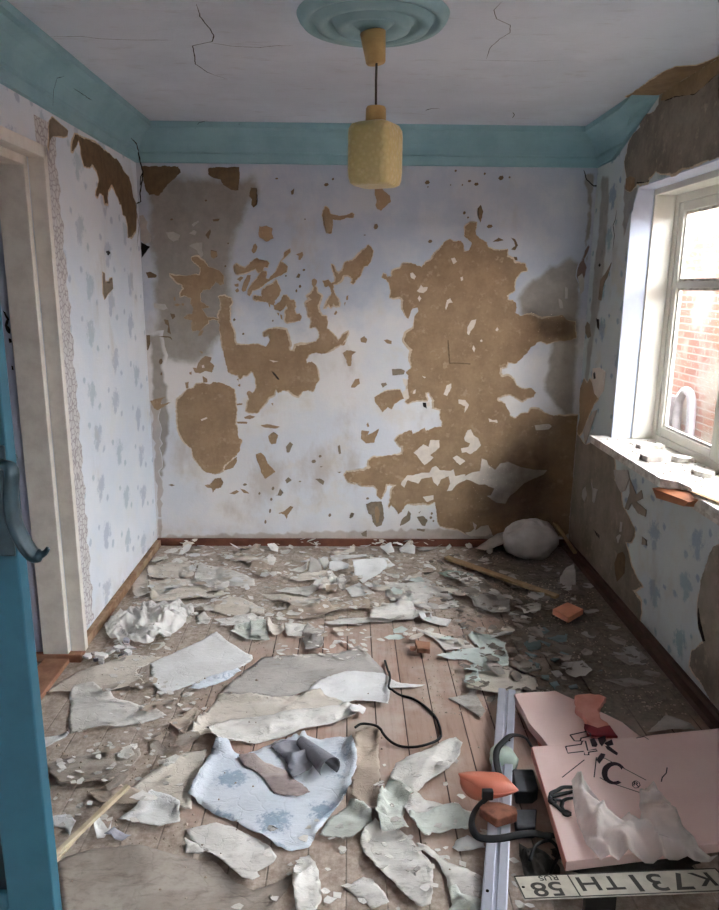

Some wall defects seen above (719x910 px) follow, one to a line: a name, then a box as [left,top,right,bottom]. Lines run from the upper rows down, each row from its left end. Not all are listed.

crack [192,4,279,79]
flaking render [624,55,719,193]
crack [131,138,143,242]
damp [621,181,639,248]
peeling [146,297,184,350]
damp [137,164,493,539]
damp [510,170,612,415]
peeling [237,415,293,453]
peeling [229,477,301,524]
flaking render [568,434,647,621]